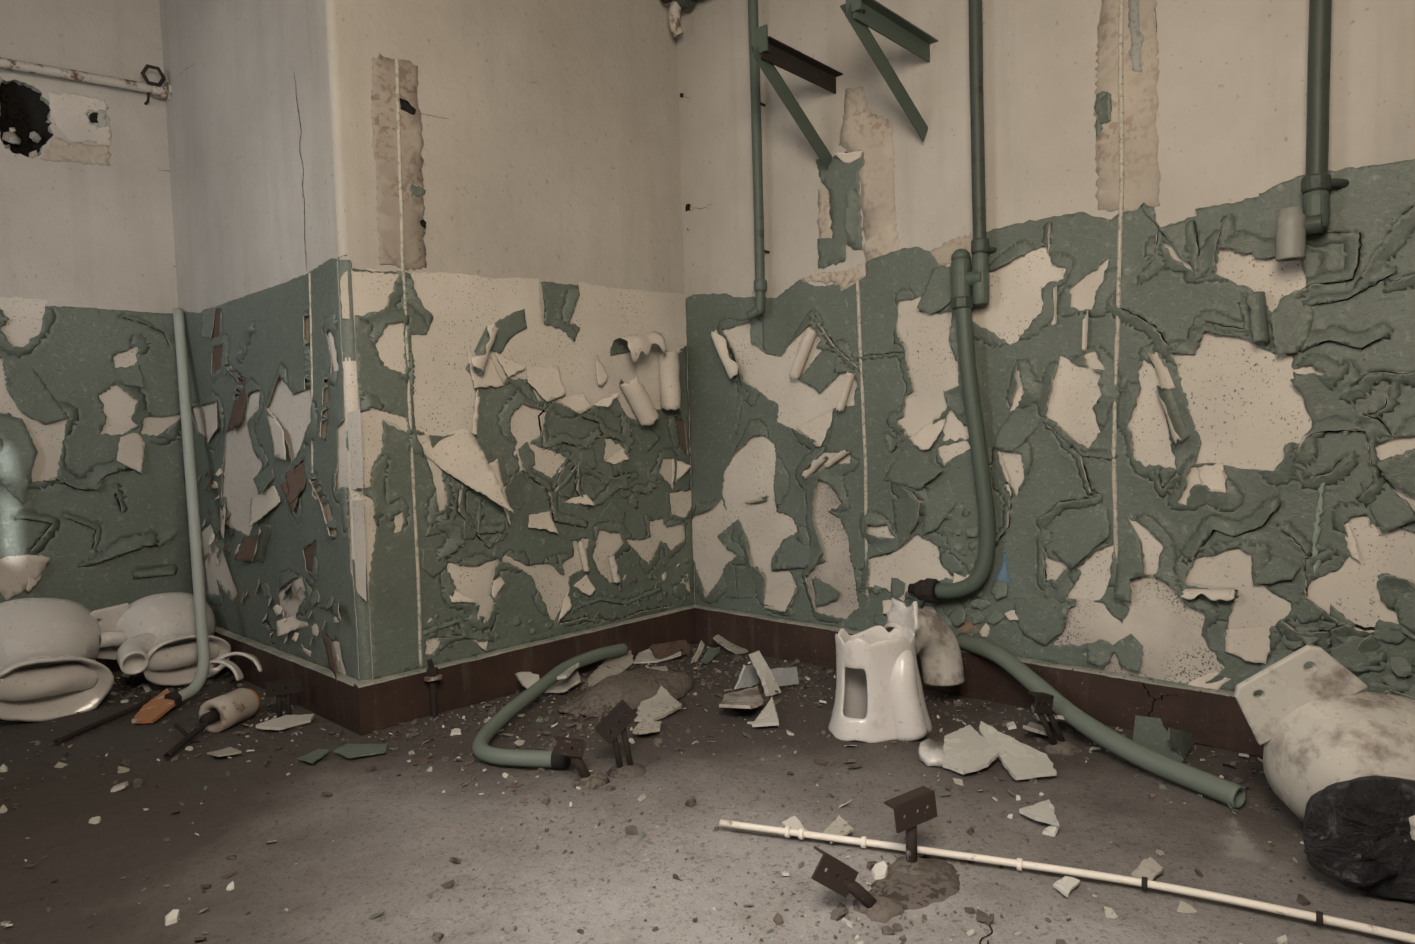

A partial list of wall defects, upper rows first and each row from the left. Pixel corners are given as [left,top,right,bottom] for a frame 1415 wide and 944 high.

flaking render [1093,0,1161,212]
peeling [0,54,1415,700]
crack [979,914,993,944]